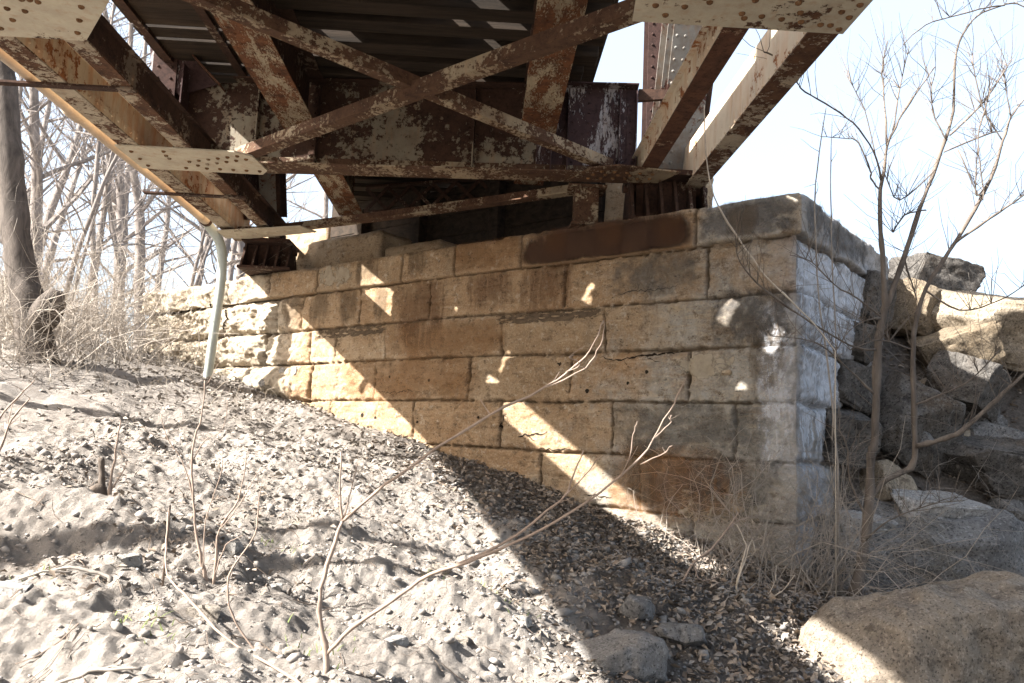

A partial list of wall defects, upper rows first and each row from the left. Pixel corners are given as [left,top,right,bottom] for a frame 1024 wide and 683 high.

rust [524,214,687,263]
crack [600,351,685,367]